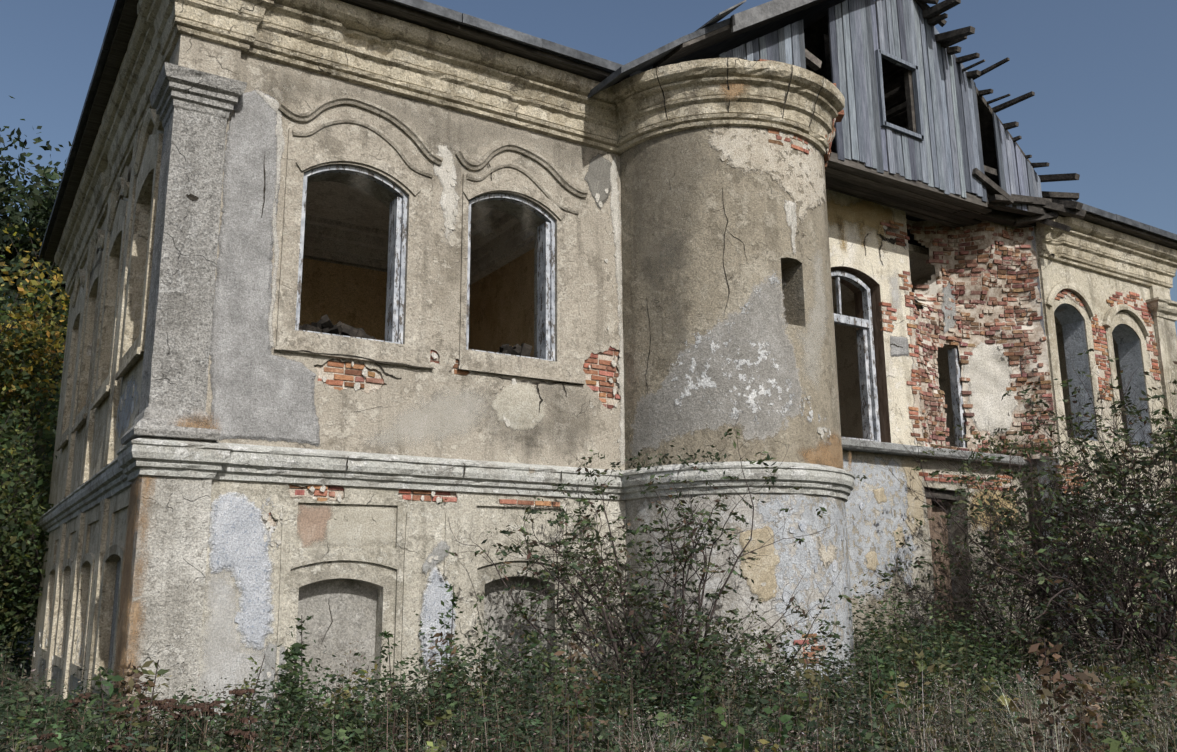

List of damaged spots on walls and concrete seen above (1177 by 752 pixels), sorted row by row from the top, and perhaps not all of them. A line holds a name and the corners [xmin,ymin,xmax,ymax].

crack [259,156,267,218]
peeling [433,145,459,239]
spalling [584,153,611,210]
crack [722,187,747,313]
peeling [706,118,836,253]
spalling [314,359,385,394]
spalling [583,346,622,410]
peeling [630,273,831,458]
flaking render [879,220,1116,494]
peeling [208,492,288,700]
peeling [419,541,457,674]
peeling [739,457,1016,683]